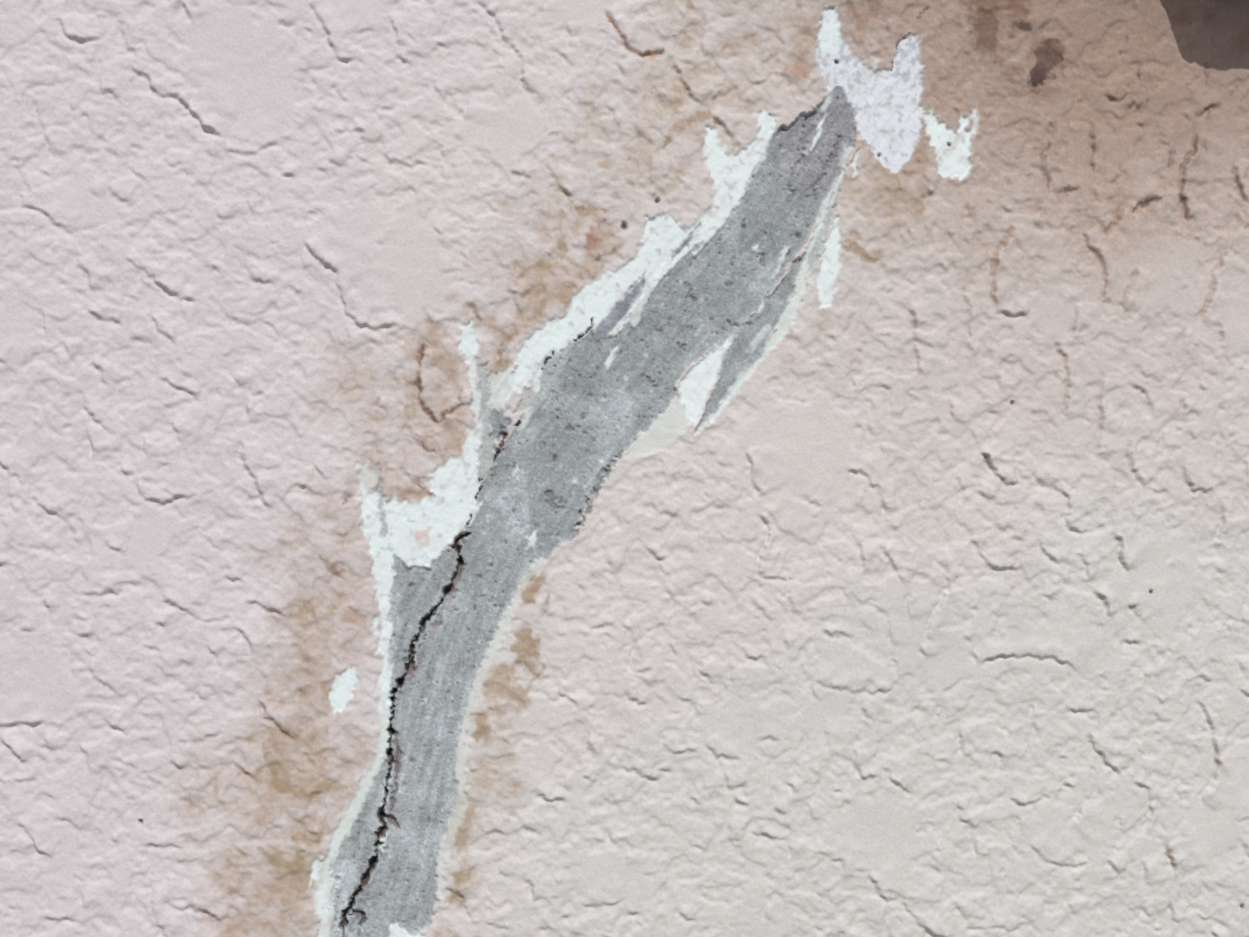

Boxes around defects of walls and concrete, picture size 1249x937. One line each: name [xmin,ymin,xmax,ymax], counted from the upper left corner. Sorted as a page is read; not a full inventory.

damp [138,29,676,937]
crack [337,415,522,937]
crack [541,316,595,371]
spalling [305,1,982,937]
damp [618,0,1249,617]